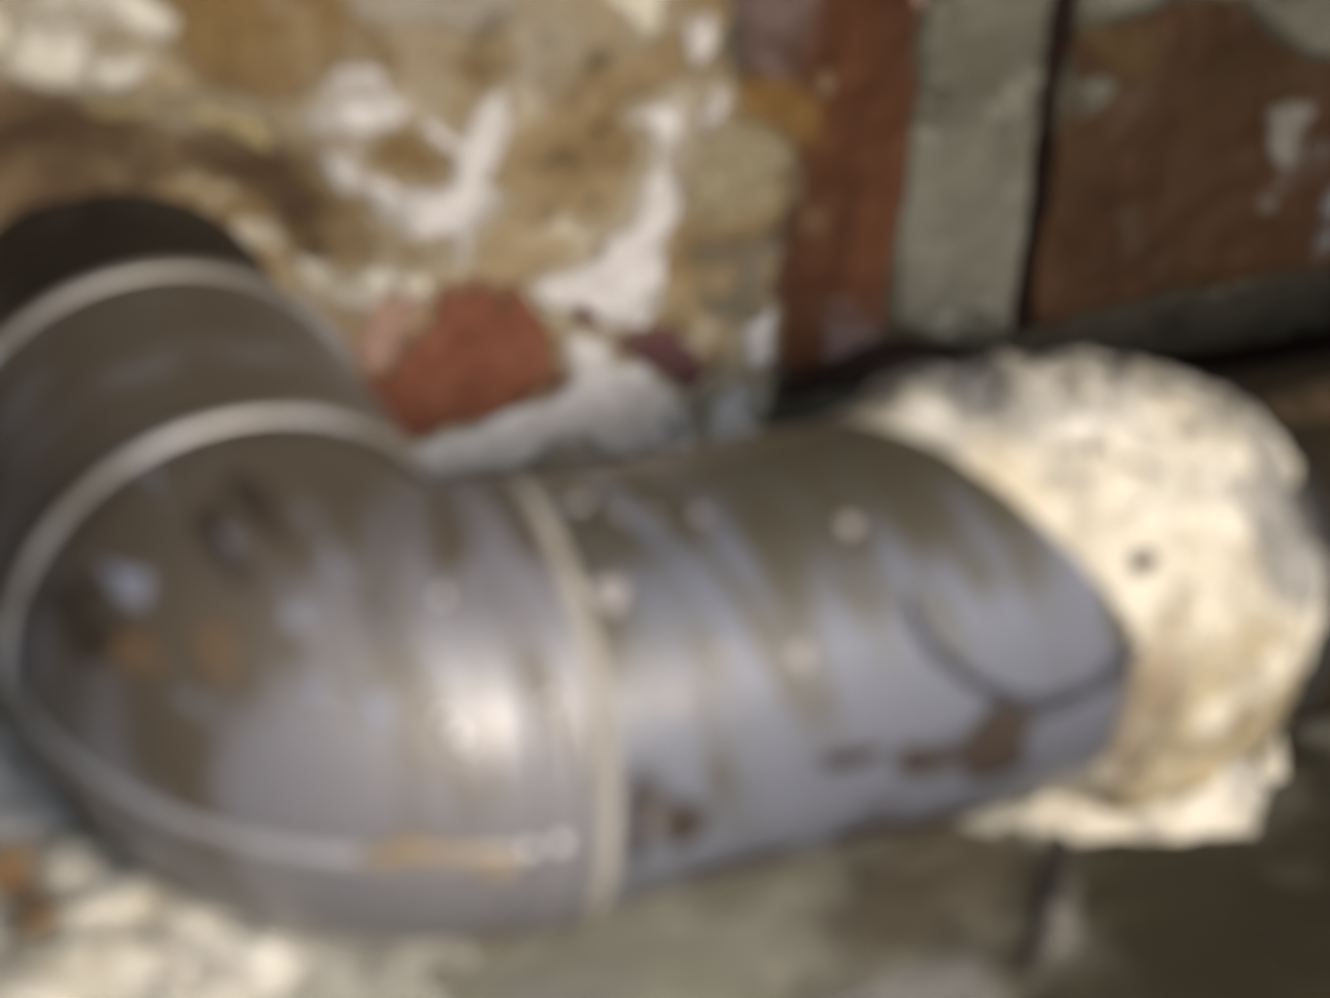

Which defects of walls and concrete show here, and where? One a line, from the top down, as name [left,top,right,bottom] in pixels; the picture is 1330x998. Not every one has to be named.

peeling [609,0,662,42]
peeling [685,16,717,65]
peeling [0,0,273,150]
peeling [303,67,405,132]
spalling [1078,76,1119,111]
crack [1011,0,1077,333]
peeling [1270,104,1314,168]
peeling [293,80,774,478]